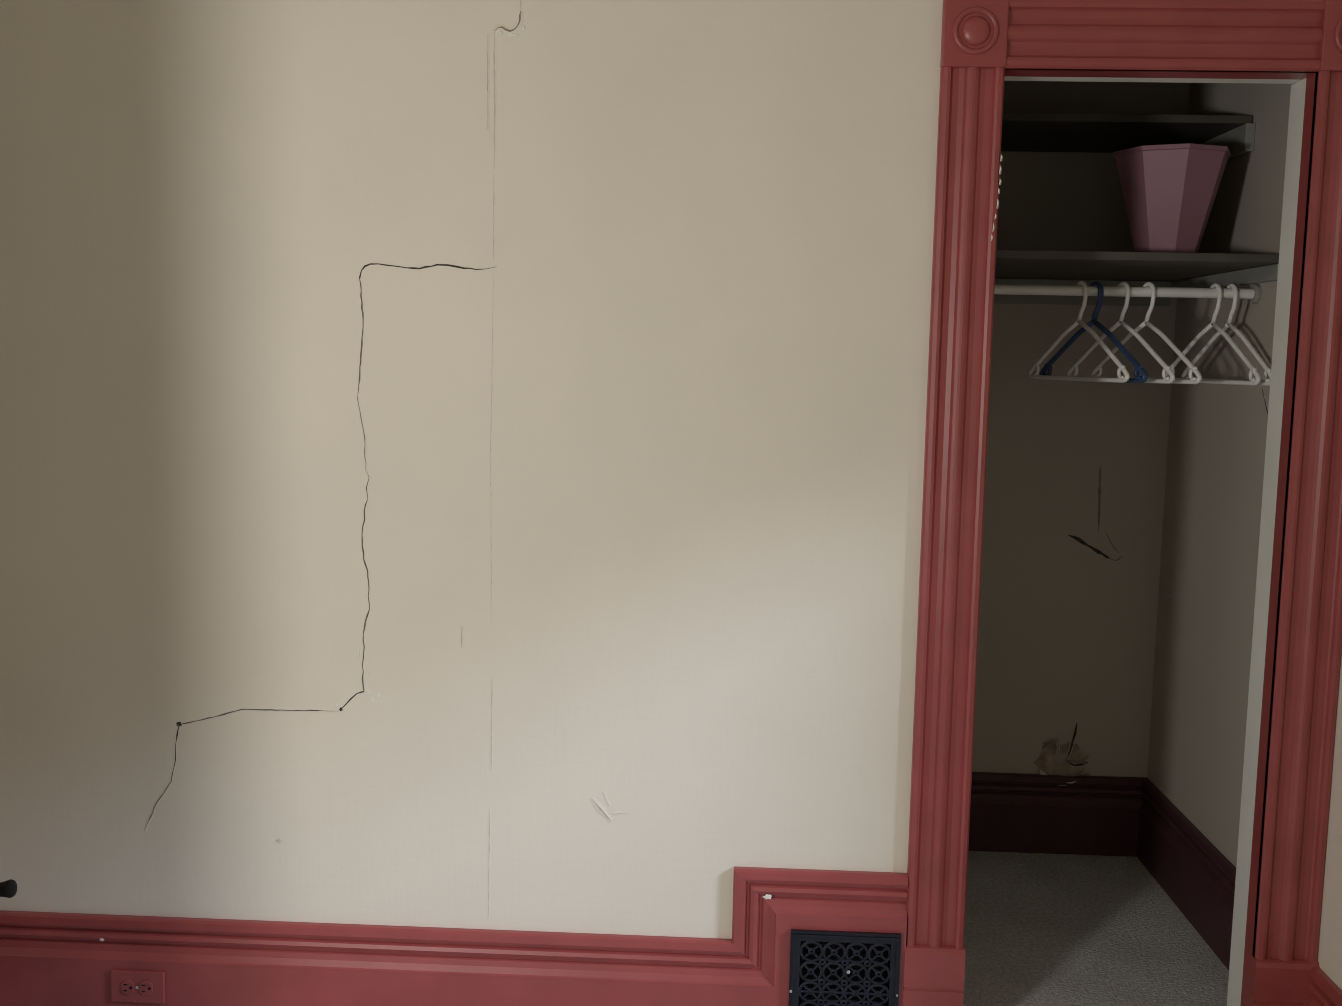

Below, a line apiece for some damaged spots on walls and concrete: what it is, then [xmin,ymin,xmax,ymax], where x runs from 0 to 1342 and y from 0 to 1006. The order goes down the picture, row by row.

crack [144,0,525,832]